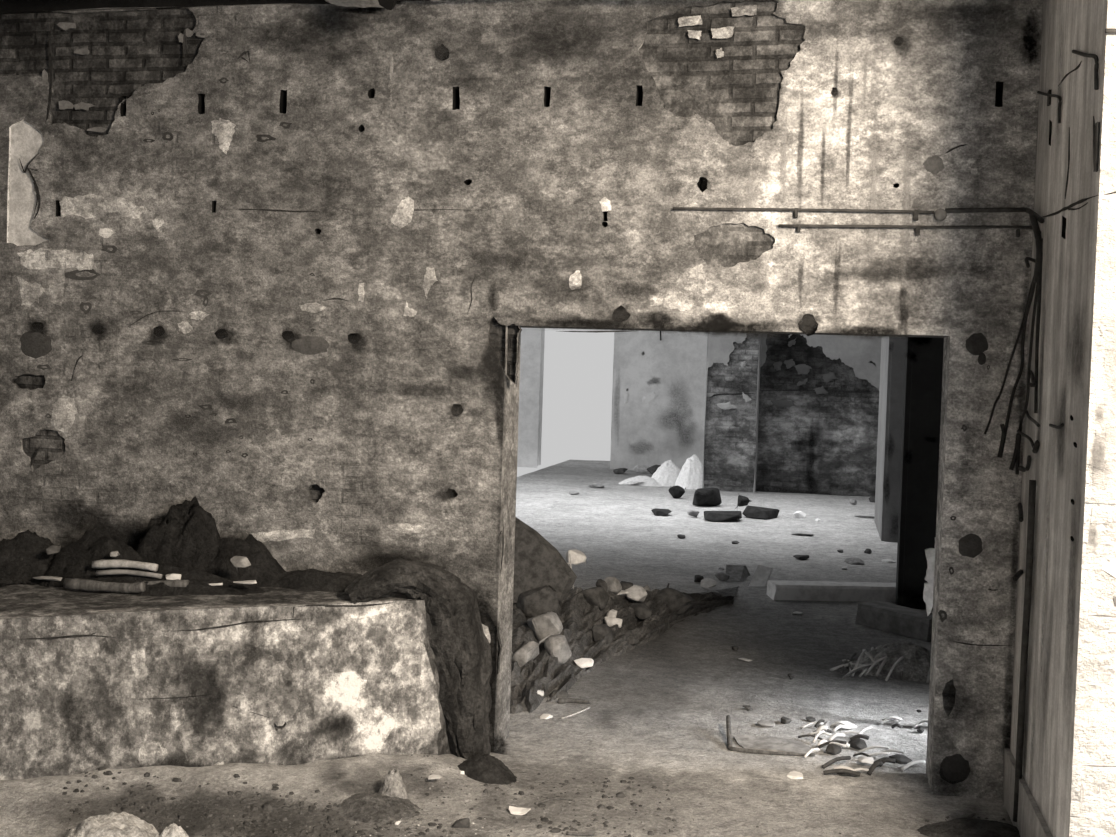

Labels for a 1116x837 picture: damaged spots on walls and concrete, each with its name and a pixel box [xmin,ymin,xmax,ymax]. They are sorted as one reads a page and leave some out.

spalling [0,7,208,306]
peeling [256,122,292,142]
spalling [638,0,806,162]
spalling [704,314,879,497]